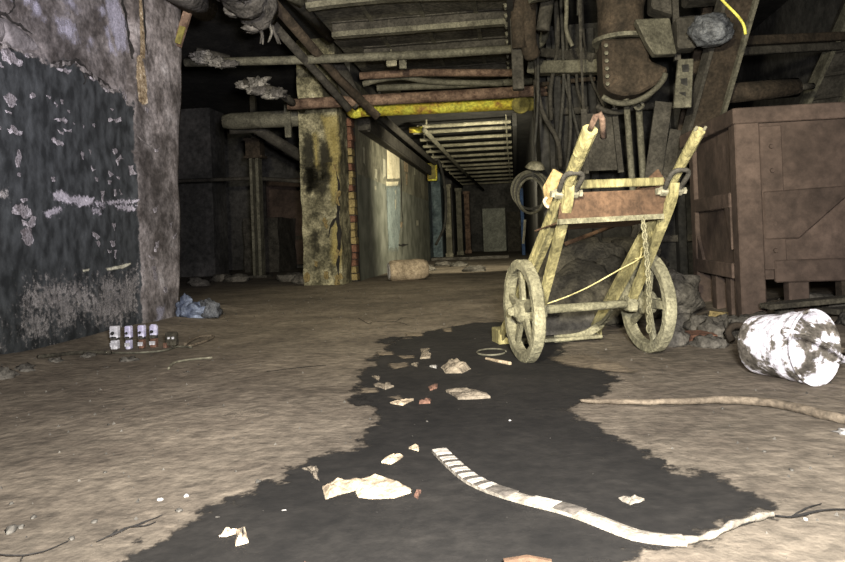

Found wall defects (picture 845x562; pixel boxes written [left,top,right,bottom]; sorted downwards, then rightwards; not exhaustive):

crack [0,0,32,37]
water stain [57,20,76,38]
water stain [100,0,126,54]
peeling [3,92,17,114]
peeling [46,95,95,146]
peeling [101,148,137,202]
water stain [302,116,339,198]
peeling [12,198,36,246]
water stain [46,190,139,218]
water stain [331,224,340,268]
water stain [21,263,146,345]